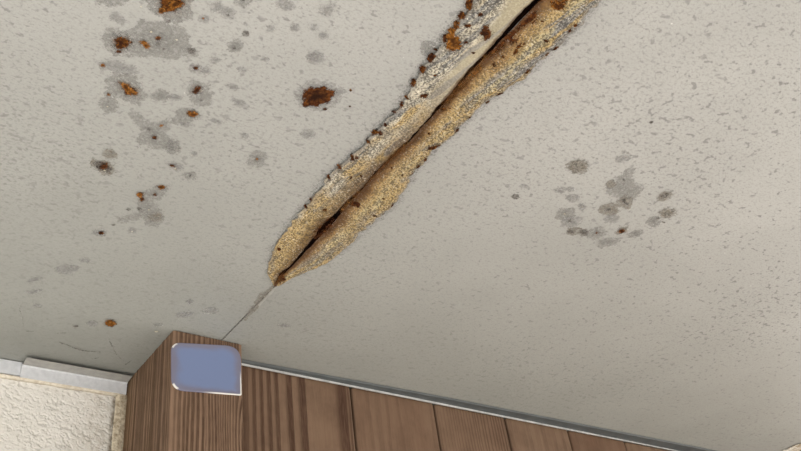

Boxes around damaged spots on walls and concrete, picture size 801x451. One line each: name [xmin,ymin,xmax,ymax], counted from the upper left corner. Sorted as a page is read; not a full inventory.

rust [100,0,198,104]
damp [228,31,249,52]
rust [410,0,568,111]
rust [130,80,212,154]
rust [295,82,352,111]
rust [90,158,116,176]
damp [93,185,166,236]
rust [341,143,408,211]
crack [222,0,540,340]
damp [555,151,675,249]